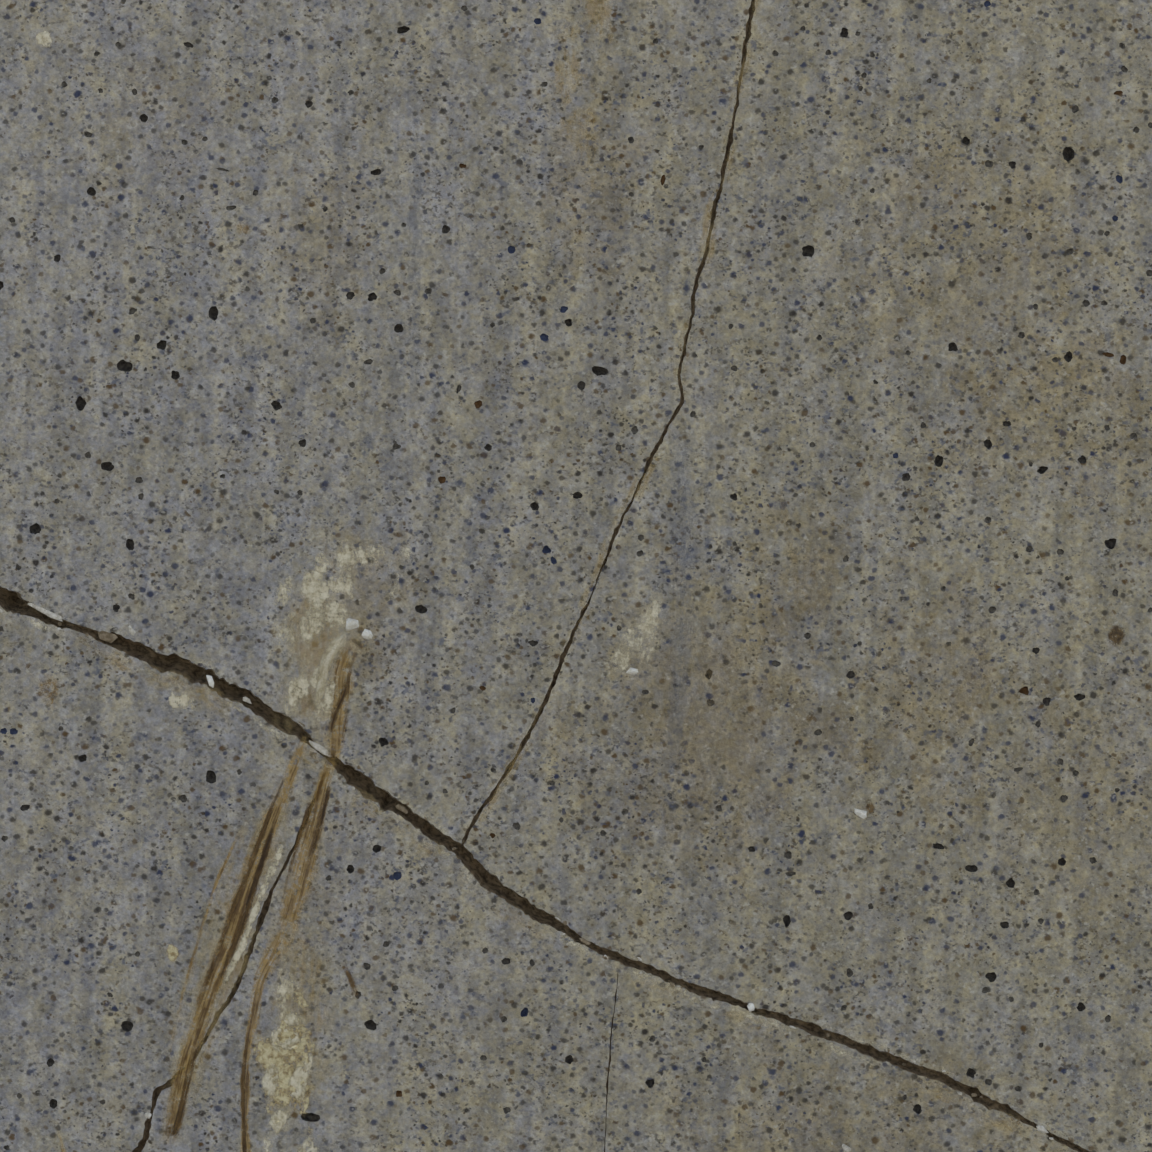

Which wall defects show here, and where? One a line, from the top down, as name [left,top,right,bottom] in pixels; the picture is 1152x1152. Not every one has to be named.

crack [460,0,755,848]
rust [164,741,305,1138]
rust [240,597,356,1152]
rust [345,968,358,995]
crack [0,586,1092,1152]